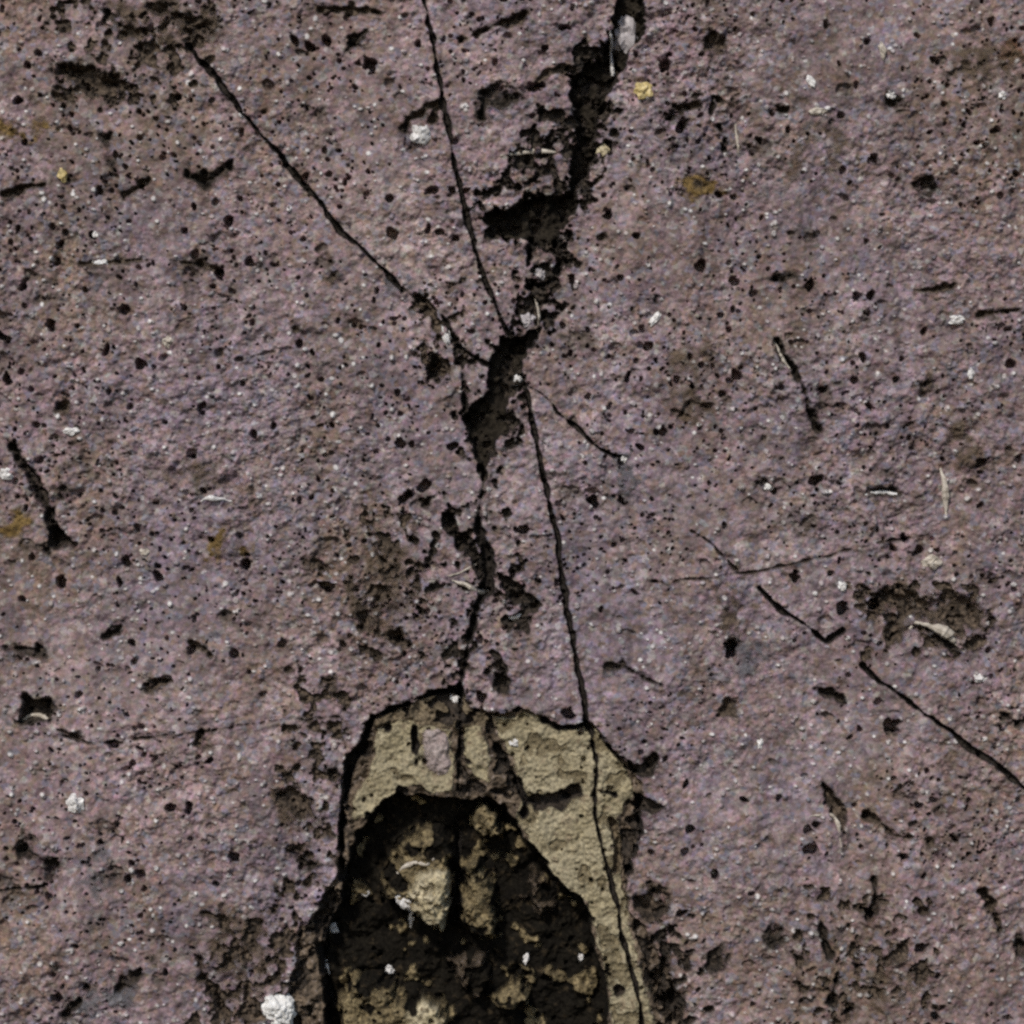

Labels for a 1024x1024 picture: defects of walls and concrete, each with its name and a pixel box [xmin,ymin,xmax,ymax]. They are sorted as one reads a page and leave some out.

hole [458,10,529,43]
hole [473,82,524,122]
peeling [500,148,556,157]
crack [185,0,646,1024]
crack [877,534,930,544]
crack [652,530,851,644]
crack [61,715,340,744]
crack [859,662,1024,789]
spalling [184,660,730,1024]